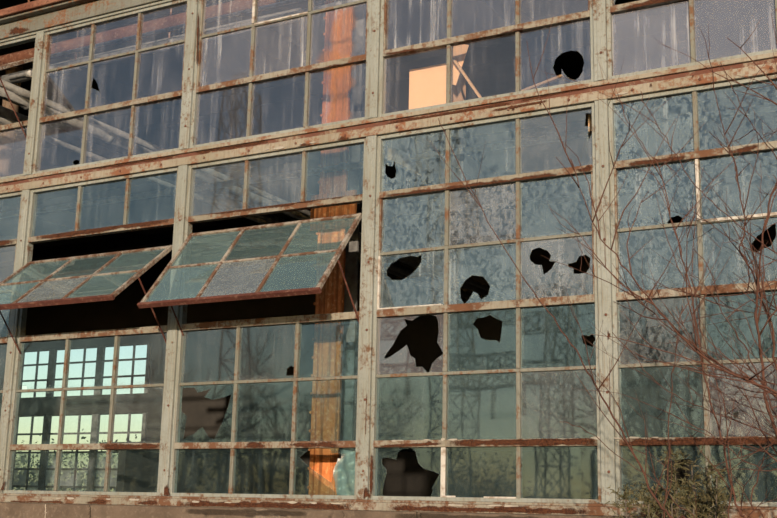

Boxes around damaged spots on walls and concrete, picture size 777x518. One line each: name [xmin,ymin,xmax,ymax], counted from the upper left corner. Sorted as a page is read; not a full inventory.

corrosion [389,88,587,124]
corrosion [196,141,267,154]
corrosion [450,438,594,446]
corrosion [626,437,777,445]
corrosion [393,505,589,514]